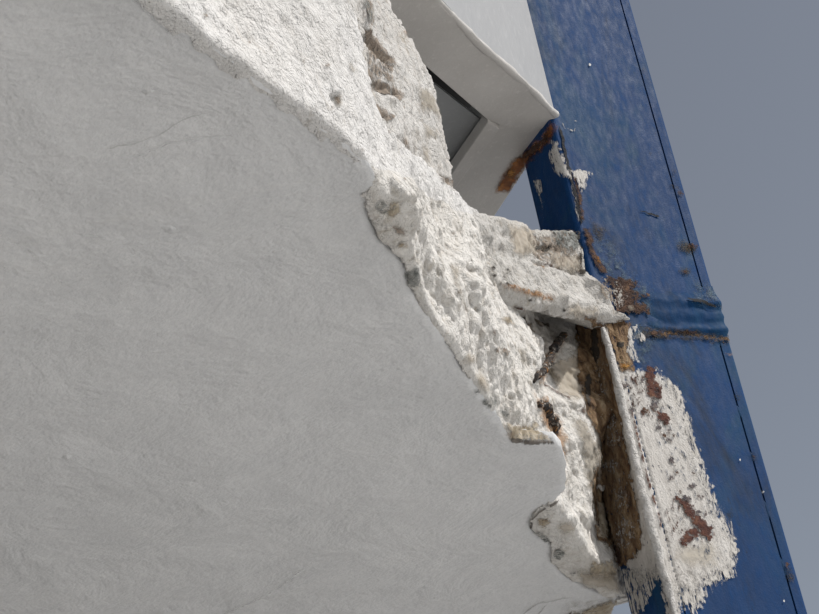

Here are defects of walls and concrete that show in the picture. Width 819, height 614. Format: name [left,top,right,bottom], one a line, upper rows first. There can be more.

flaking render [347,0,456,191]
corrosion [497,125,553,192]
peeling [549,140,593,220]
spalling [360,167,740,614]
corrosion [533,225,650,569]
corrosion [643,328,730,341]